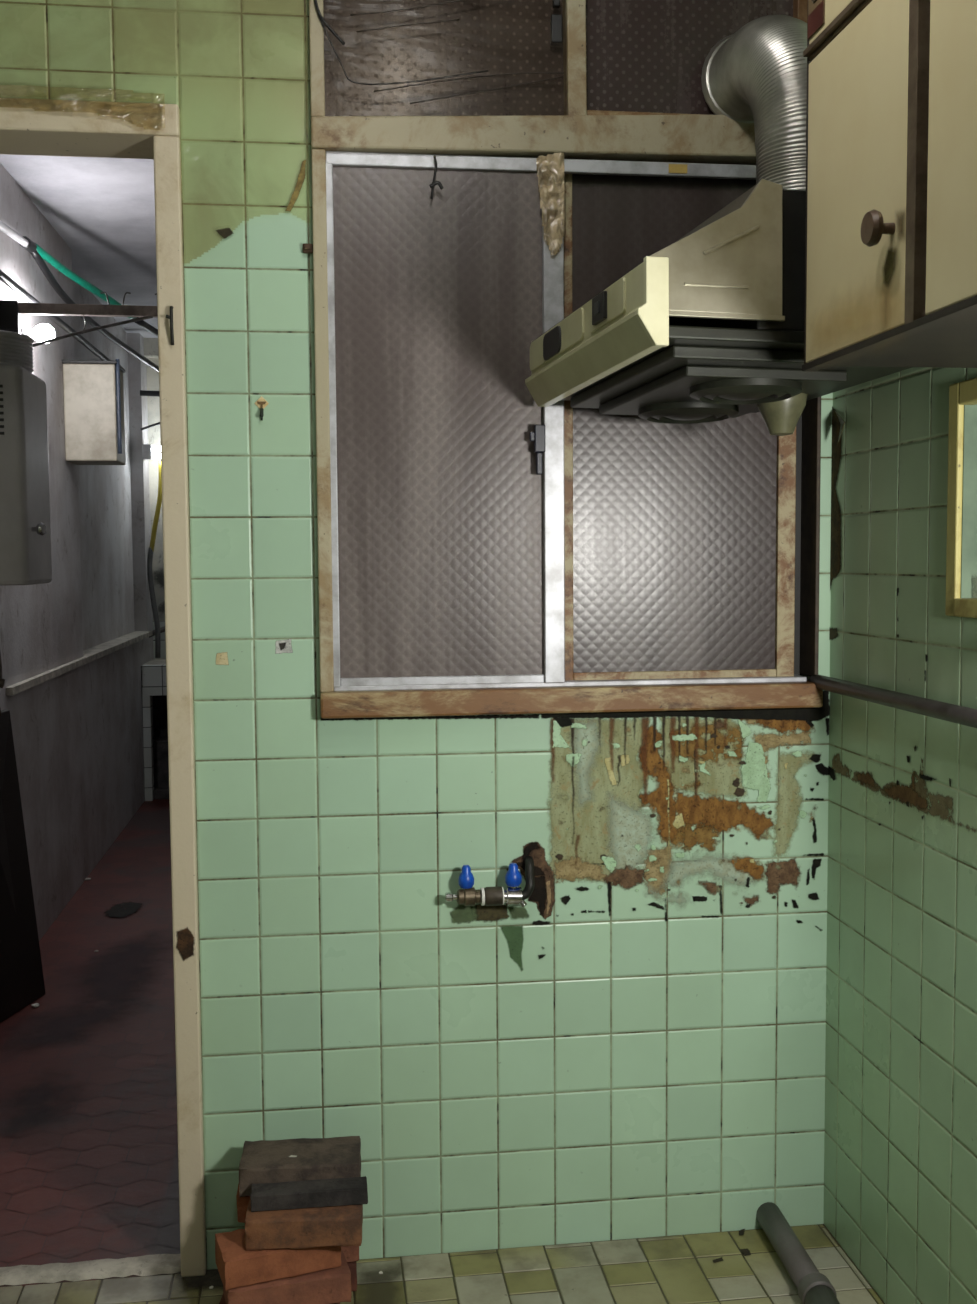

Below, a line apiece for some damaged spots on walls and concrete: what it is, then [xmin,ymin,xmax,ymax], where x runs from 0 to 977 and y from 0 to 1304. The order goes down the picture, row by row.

peeling [507,717,816,920]
rust [638,719,814,881]
peeling [832,753,976,832]